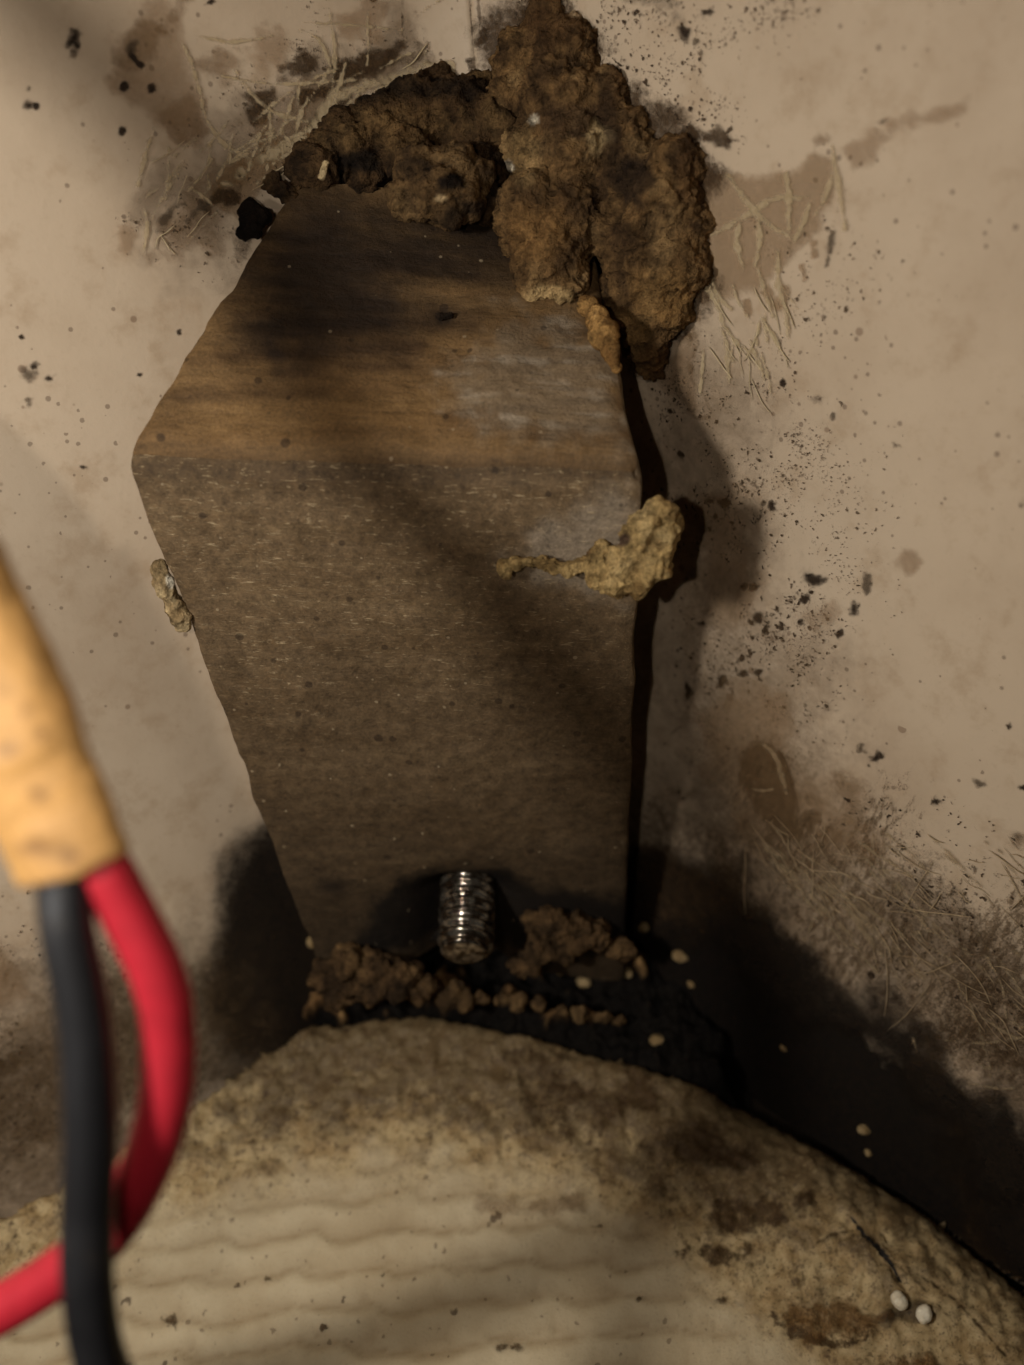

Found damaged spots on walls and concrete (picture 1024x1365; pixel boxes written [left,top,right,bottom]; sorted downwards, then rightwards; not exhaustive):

peeling [115,0,455,282]